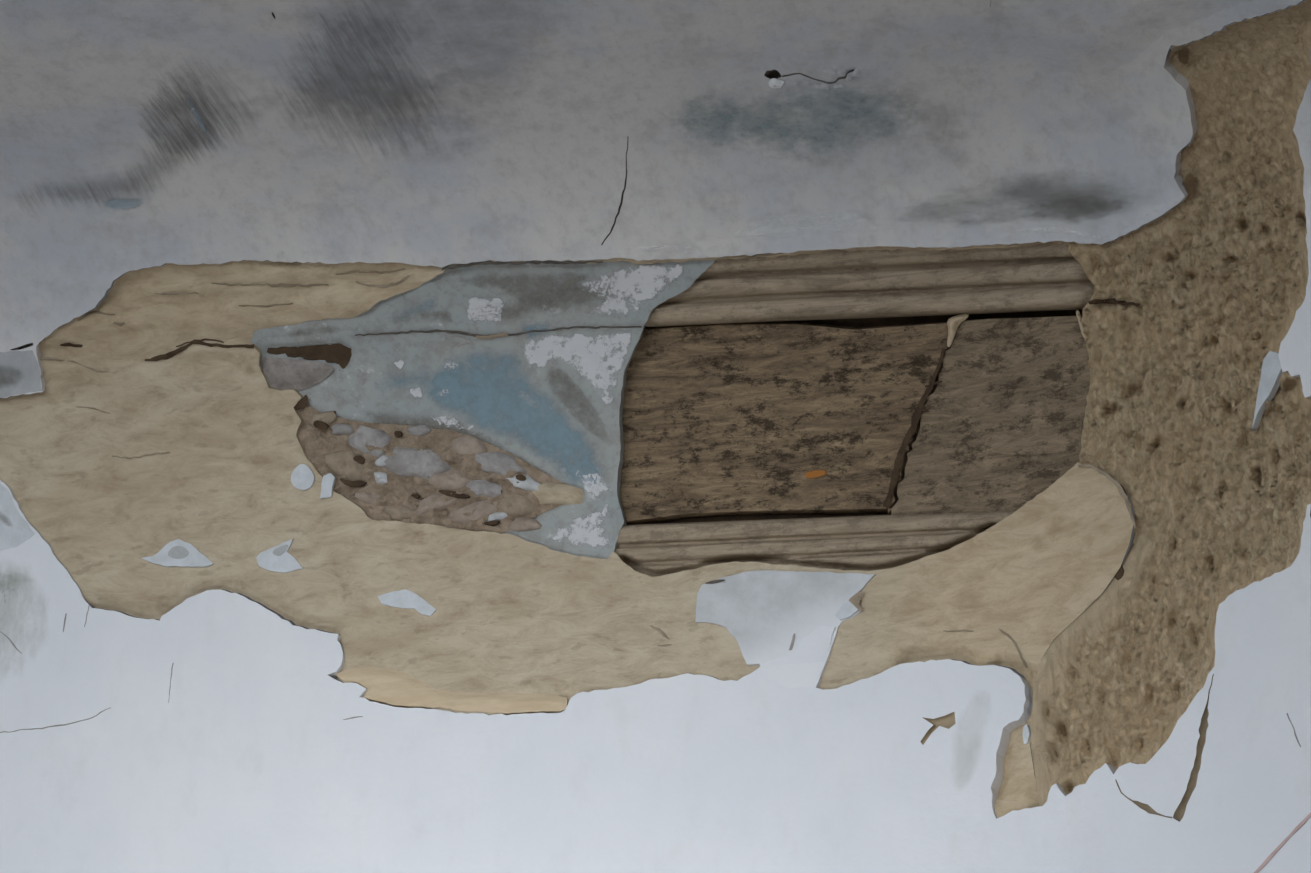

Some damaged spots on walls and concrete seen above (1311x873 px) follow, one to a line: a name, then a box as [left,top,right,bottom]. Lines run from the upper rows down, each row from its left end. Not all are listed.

spalling [1178,49,1189,64]
spalling [1182,174,1197,201]
spalling [590,249,833,264]
peeling [1251,351,1283,431]
peeling [250,259,715,559]
crack [883,348,945,508]
peeling [0,484,35,551]
peeling [142,539,214,568]
peeling [256,539,303,573]
peeling [377,589,436,616]
peeling [695,570,875,688]
peeling [1022,724,1031,744]